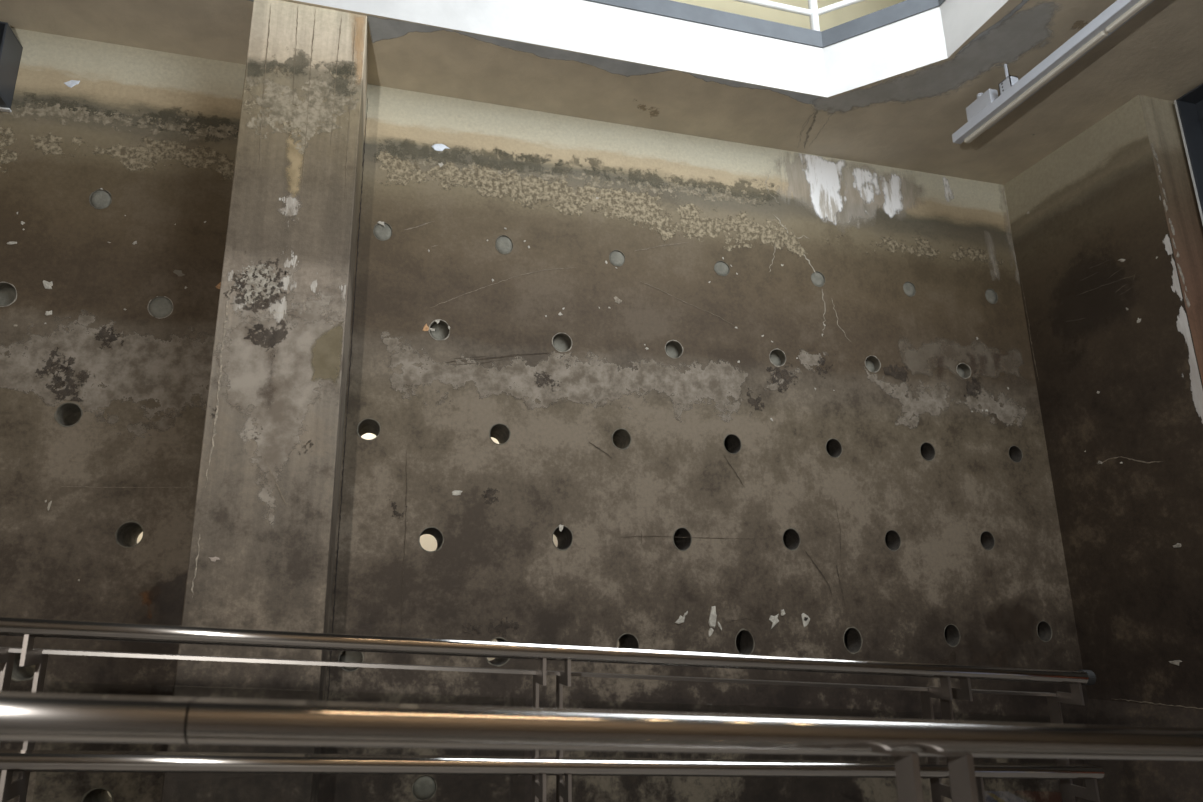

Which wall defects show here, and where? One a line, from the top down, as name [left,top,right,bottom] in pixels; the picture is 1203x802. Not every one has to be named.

leakage [135,108,239,141]
crack [797,109,833,149]
leakage [375,141,921,225]
peeling [277,193,302,226]
peeling [1151,143,1203,424]
leakage [95,325,124,349]
leakage [35,347,91,402]
peeling [0,252,346,525]
leakage [534,371,561,391]
leakage [746,363,798,413]
spalling [708,606,722,637]
spalling [769,609,786,629]